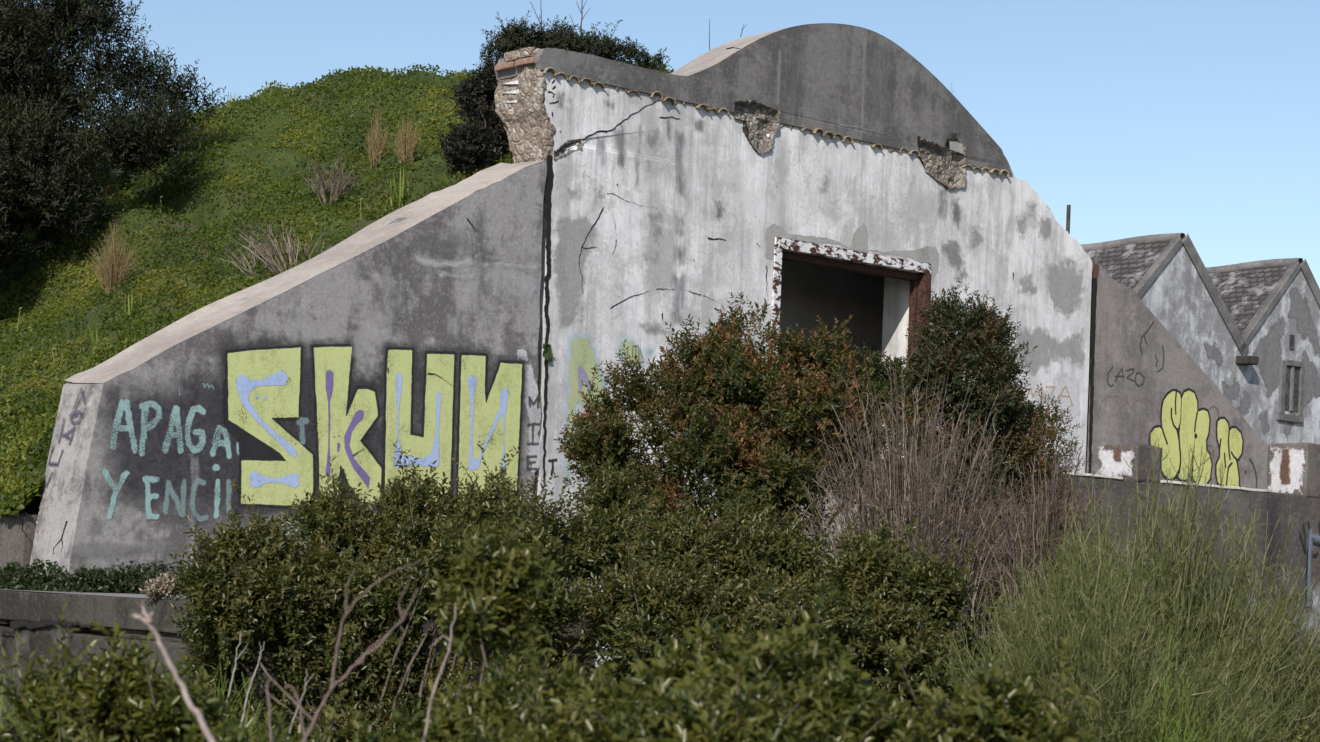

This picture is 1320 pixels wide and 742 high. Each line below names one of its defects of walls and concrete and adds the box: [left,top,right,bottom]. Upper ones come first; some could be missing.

spalling [494,65,582,164]
spalling [733,100,781,154]
spalling [917,136,967,210]
peeling [1018,204,1051,238]
peeling [765,223,983,284]
crack [543,100,680,485]
crack [610,288,715,309]
corrosion [1280,448,1290,484]